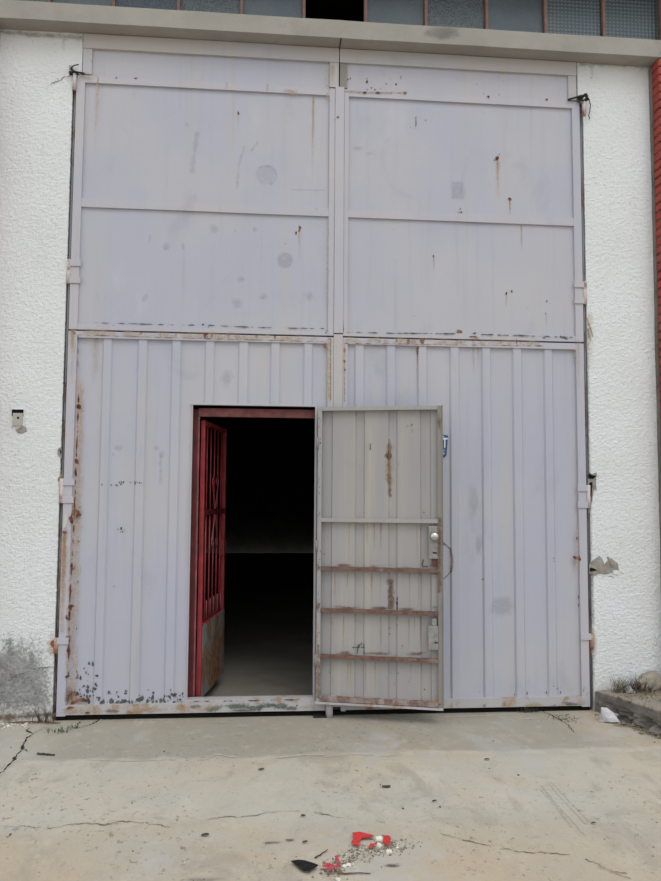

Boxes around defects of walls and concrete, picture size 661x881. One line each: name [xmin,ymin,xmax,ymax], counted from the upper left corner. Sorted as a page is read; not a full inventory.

corrosion [61,389,83,709]
flaking render [589,556,621,576]
leakage [0,638,57,722]
crack [0,719,102,774]